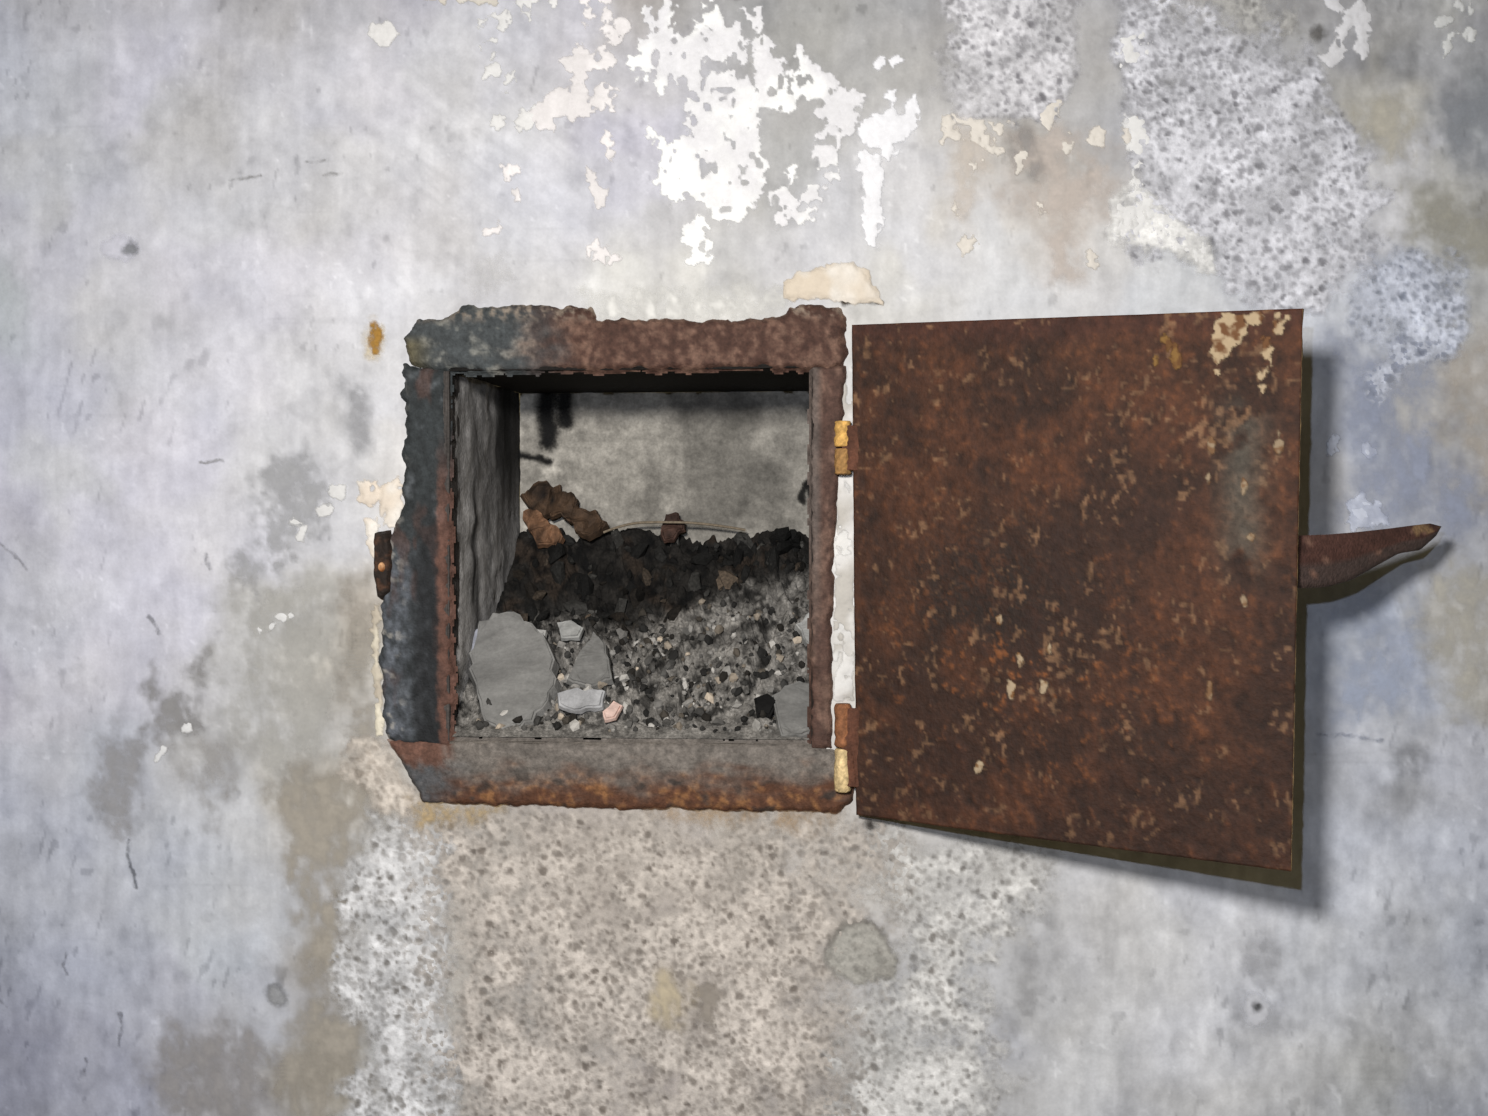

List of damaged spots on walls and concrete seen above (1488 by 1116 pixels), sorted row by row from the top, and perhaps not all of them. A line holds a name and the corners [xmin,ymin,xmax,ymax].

peeling [439,0,557,93]
peeling [490,0,921,266]
damp [1015,128,1101,279]
flaking render [783,262,883,305]